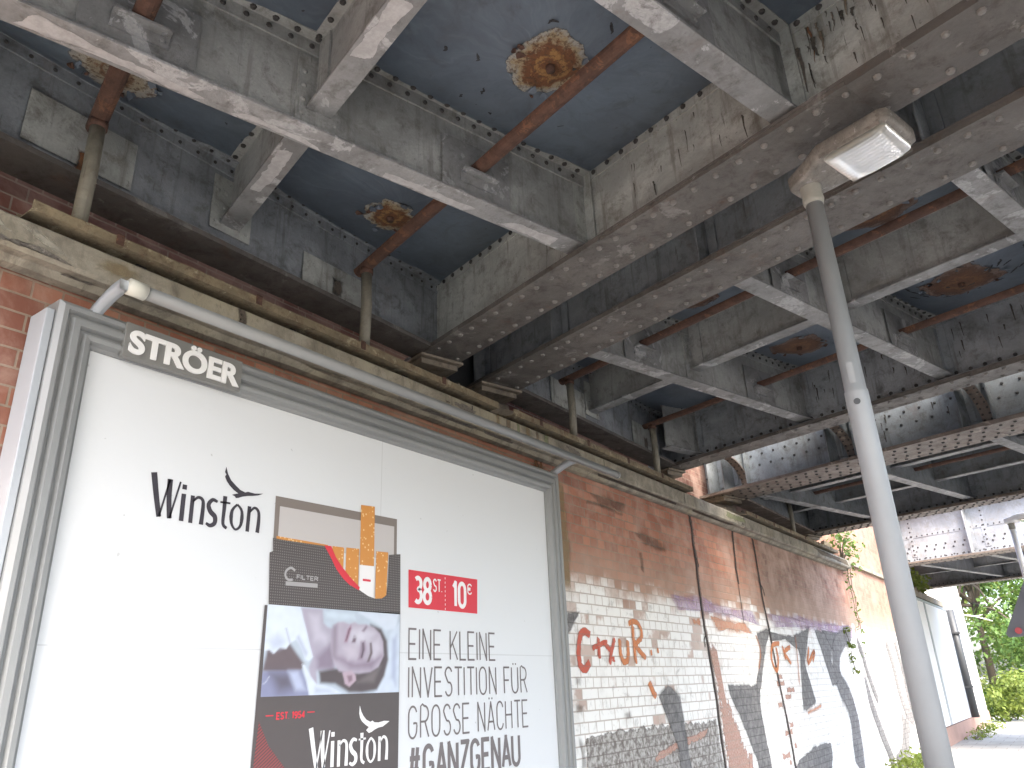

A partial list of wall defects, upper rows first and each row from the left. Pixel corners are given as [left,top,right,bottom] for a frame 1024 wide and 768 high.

peeling [13,15,205,99]
corrosion [505,27,590,99]
corrosion [355,199,414,232]
corrosion [917,262,1012,297]
crack [688,515,727,768]
crack [732,532,797,768]